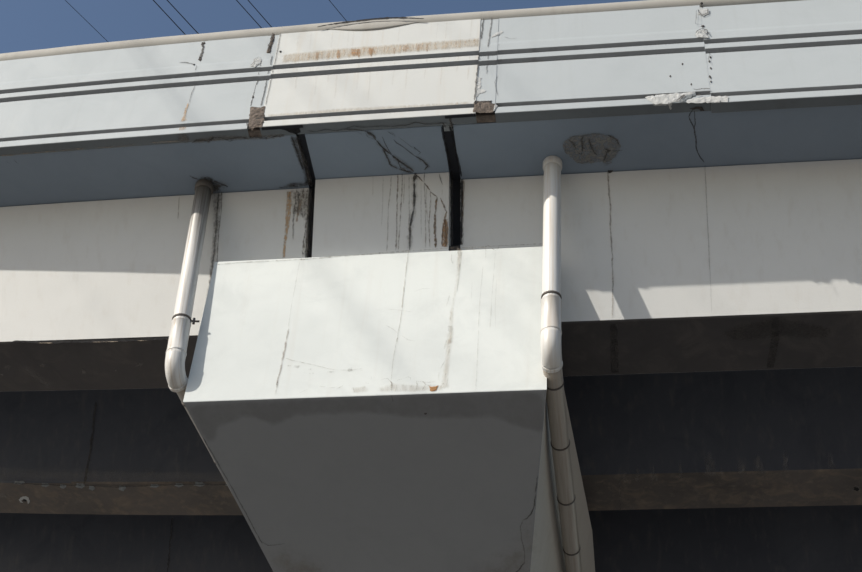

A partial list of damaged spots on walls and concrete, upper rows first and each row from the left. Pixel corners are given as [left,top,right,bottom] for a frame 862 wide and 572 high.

spalling [695,2,710,38]
crack [181,42,205,93]
spalling [246,106,265,129]
crack [251,38,280,105]
spalling [473,77,497,113]
peeling [645,56,729,110]
crack [689,107,704,162]
crack [311,118,453,211]
rust [283,192,302,257]